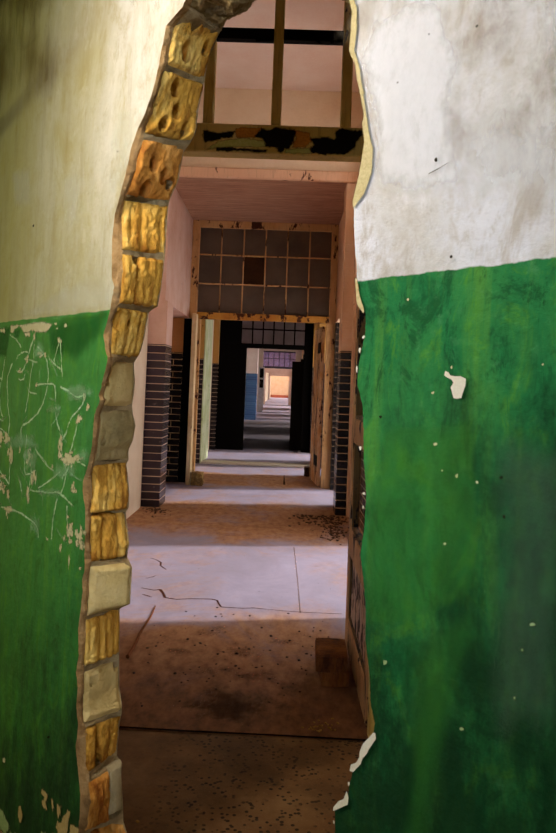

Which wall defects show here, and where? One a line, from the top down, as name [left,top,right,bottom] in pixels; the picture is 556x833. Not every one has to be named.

flaking render [202,0,373,208]
flaking render [355,278,364,313]
peeling [0,322,67,343]
peeling [444,366,466,399]
peeling [0,431,36,502]
peeling [51,435,83,469]
peeling [59,515,86,565]
crack [142,558,234,608]
flaking render [350,733,376,772]
peeling [0,809,15,833]
peeling [41,790,79,833]
flaking render [333,782,350,823]